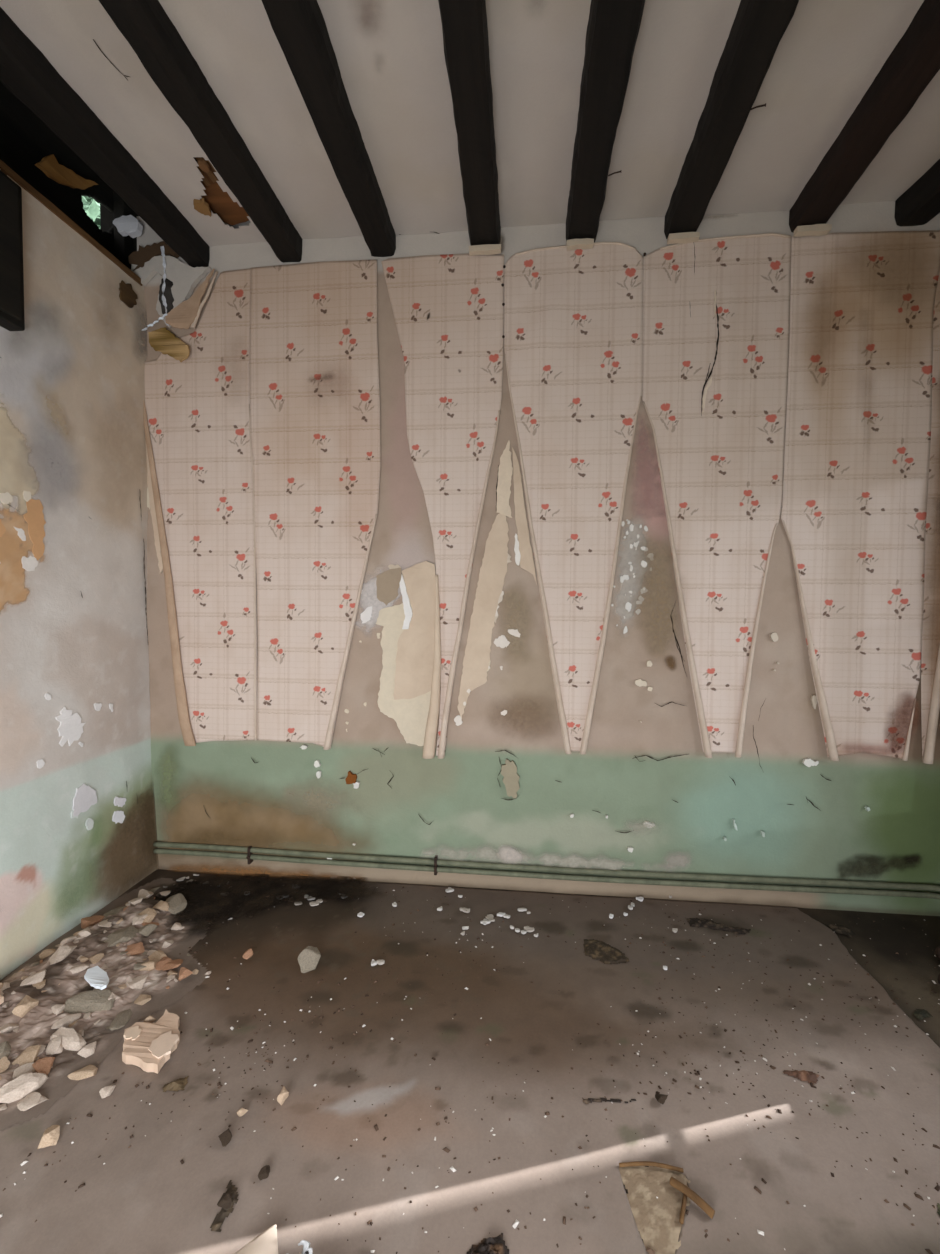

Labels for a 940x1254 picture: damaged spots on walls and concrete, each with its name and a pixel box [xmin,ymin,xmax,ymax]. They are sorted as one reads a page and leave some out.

flaking render [193,157,249,226]
flaking render [119,241,180,308]
flaking render [159,278,174,314]
peeling [0,407,46,611]
peeling [507,448,537,584]
peeling [611,519,654,634]
peeling [494,591,520,648]
peeling [393,561,441,759]
peeling [44,693,86,747]
damp [890,699,916,748]
damp [107,752,351,886]
damp [840,856,920,878]